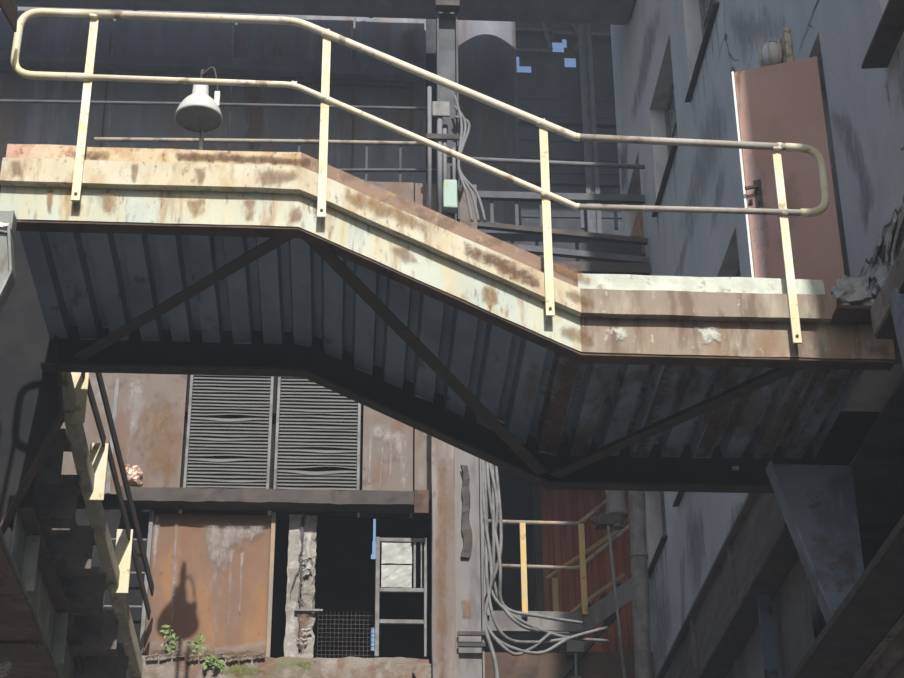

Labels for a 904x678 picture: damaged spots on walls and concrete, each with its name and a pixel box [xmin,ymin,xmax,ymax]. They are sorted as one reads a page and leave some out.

corrosion [466,245,539,286]
flaking render [858,195,904,299]
corrosion [484,289,497,312]
damp [208,524,261,573]
spalling [303,533,313,575]